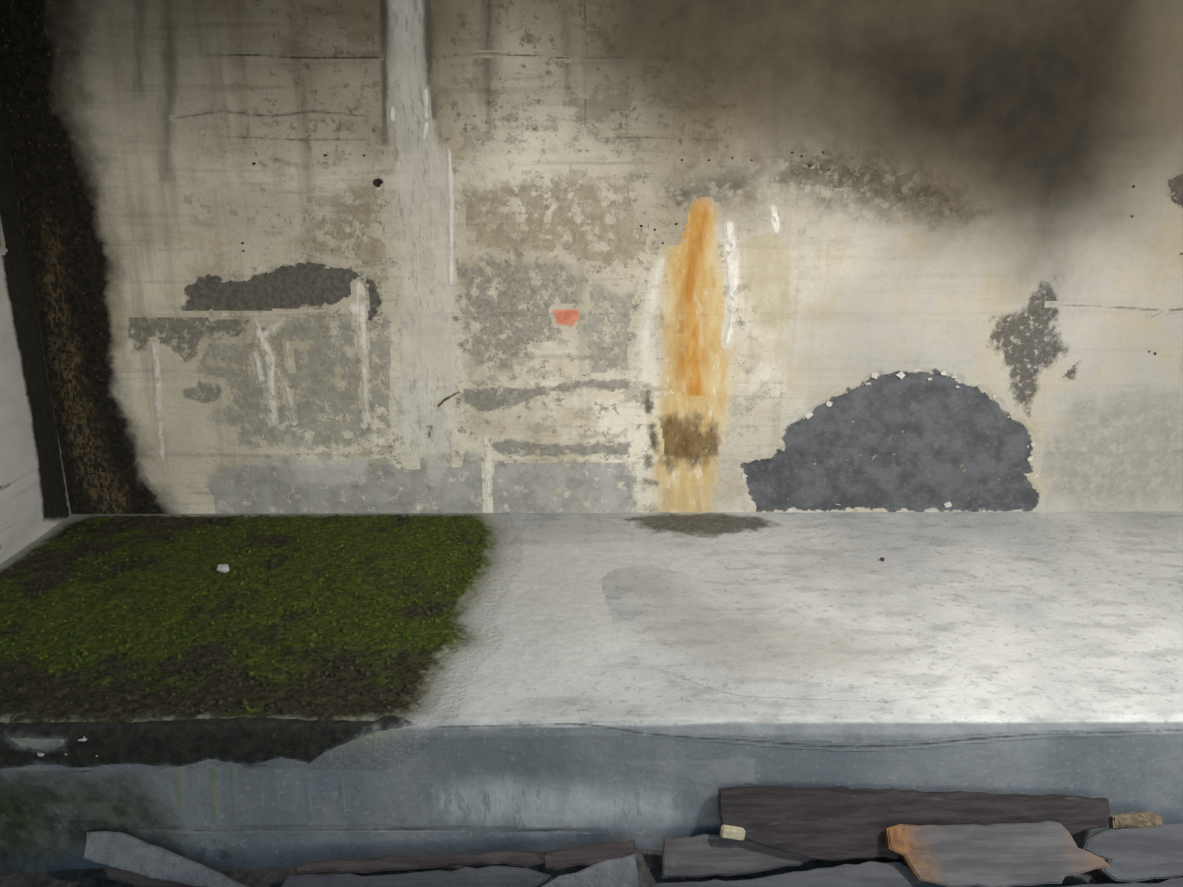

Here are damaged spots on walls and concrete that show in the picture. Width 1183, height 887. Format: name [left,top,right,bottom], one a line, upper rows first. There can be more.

peeling [125,147,392,455]
damp [0,0,640,564]
corrosion [627,197,752,512]
damp [463,0,1183,512]
spalling [733,259,1087,512]
spalling [1160,161,1183,218]